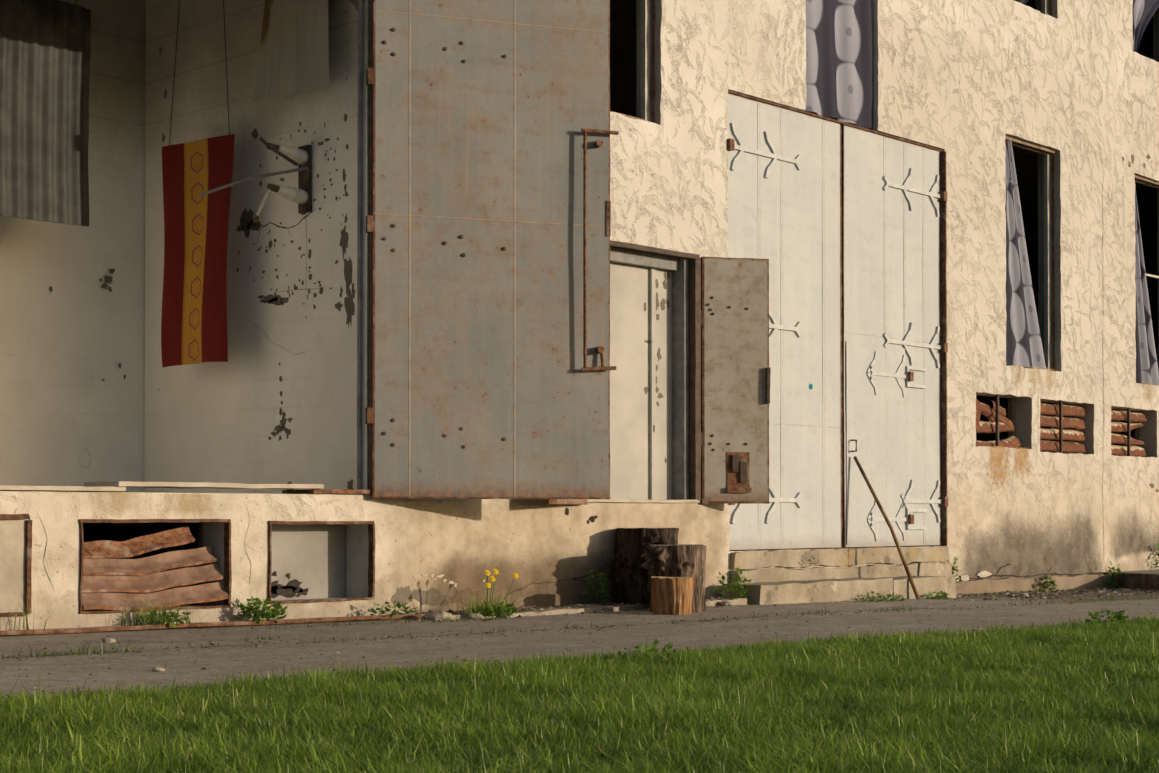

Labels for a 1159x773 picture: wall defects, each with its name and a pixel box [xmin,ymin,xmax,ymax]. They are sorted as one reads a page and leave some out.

peeling [236,122,355,328]
peeling [268,362,293,441]
leakage [965,521,1095,581]
leakage [1116,525,1159,556]